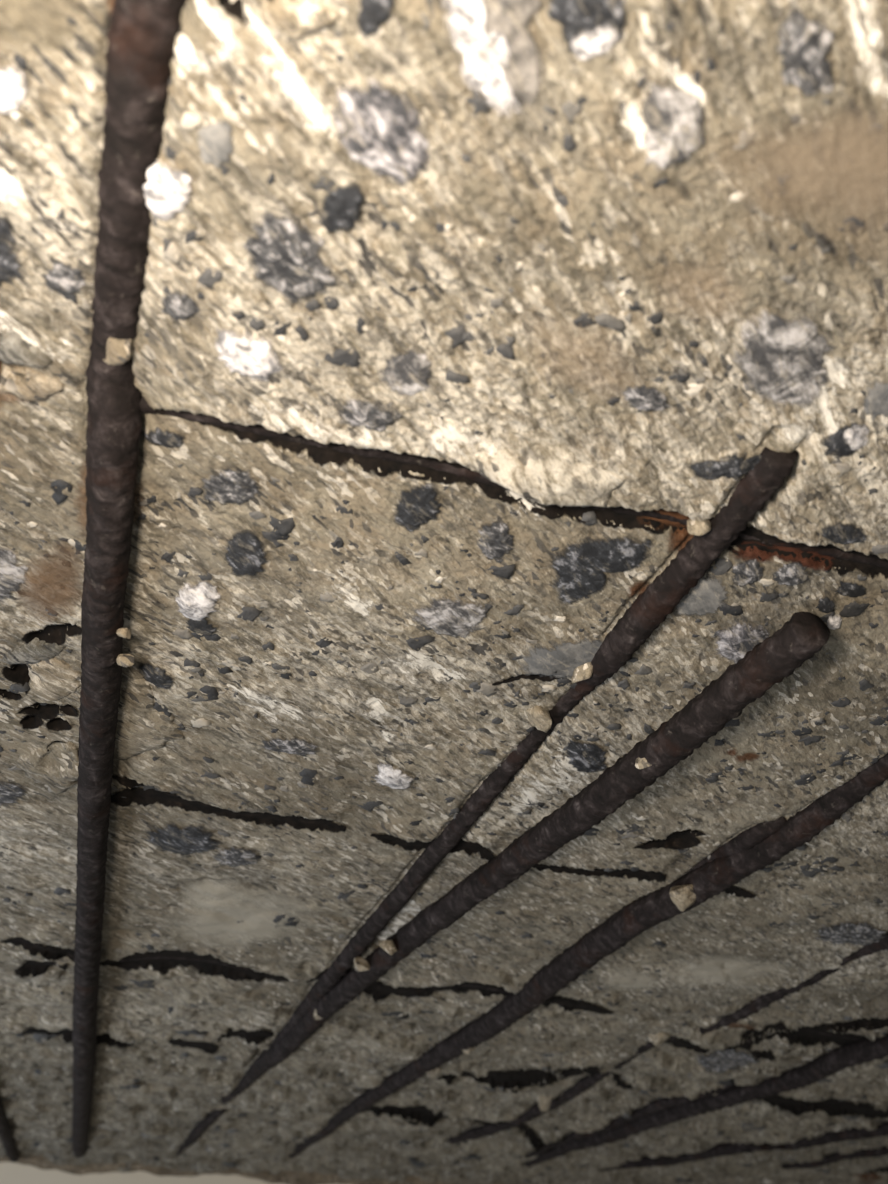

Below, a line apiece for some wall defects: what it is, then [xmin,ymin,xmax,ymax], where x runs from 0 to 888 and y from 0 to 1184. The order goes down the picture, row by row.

corrosion [78,468,87,526]
crack [153,409,694,536]
corrosion [23,558,76,614]
spalling [0,0,509,1163]
corrosion [630,583,647,596]
corrosion [646,511,693,551]
corrosion [735,543,831,570]
crack [111,775,495,862]
spalling [175,447,888,1172]
crack [0,937,511,1003]
crack [667,1017,888,1061]
crack [363,1066,634,1145]